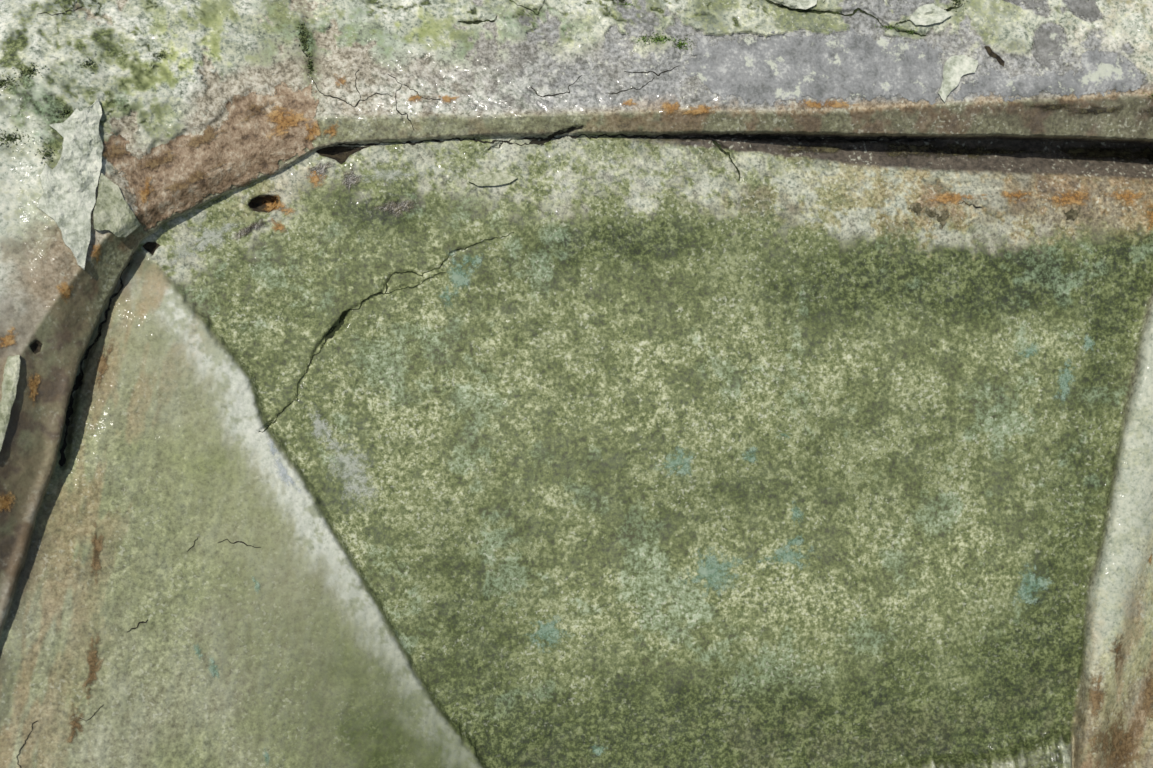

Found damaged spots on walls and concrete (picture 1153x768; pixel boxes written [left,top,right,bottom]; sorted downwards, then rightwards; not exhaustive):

crack [458,0,544,24]
flaking render [780,0,817,9]
crack [766,0,926,36]
flaking render [909,4,952,25]
spalling [1064,0,1103,22]
spalling [684,26,1148,106]
crack [312,66,936,181]
rust [662,102,716,115]
rust [804,100,858,109]
rust [265,196,293,230]
crack [259,232,514,432]
rust [1087,669,1153,768]